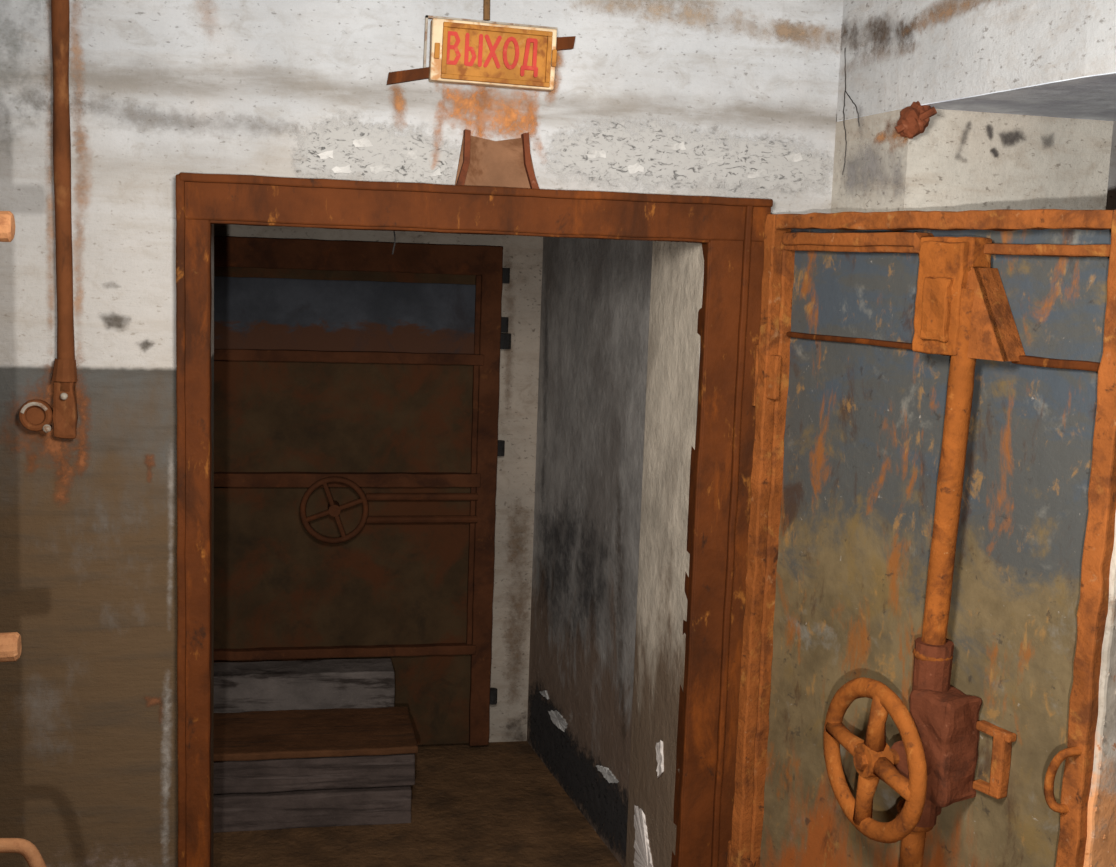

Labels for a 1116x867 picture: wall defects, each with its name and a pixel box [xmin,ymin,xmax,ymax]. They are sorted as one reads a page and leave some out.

damp [776,25,816,40]
damp [842,0,976,48]
rust [549,52,562,95]
rust [393,88,405,112]
rust [446,86,536,137]
rust [16,368,87,500]
flaking render [527,684,653,867]
flaking render [656,740,664,778]